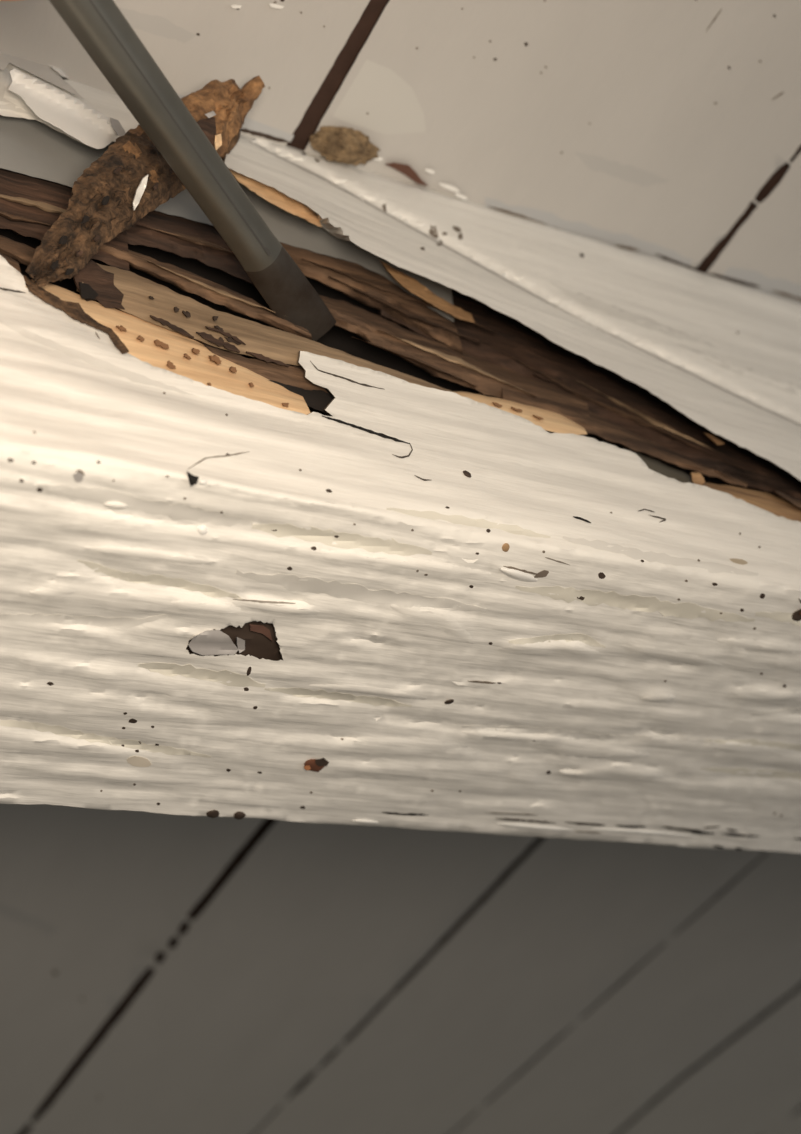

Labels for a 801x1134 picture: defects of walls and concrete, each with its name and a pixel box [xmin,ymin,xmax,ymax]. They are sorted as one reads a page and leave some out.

spalling [0,52,801,522]
crack [310,361,383,389]
crack [323,416,430,481]
peeling [186,621,282,661]